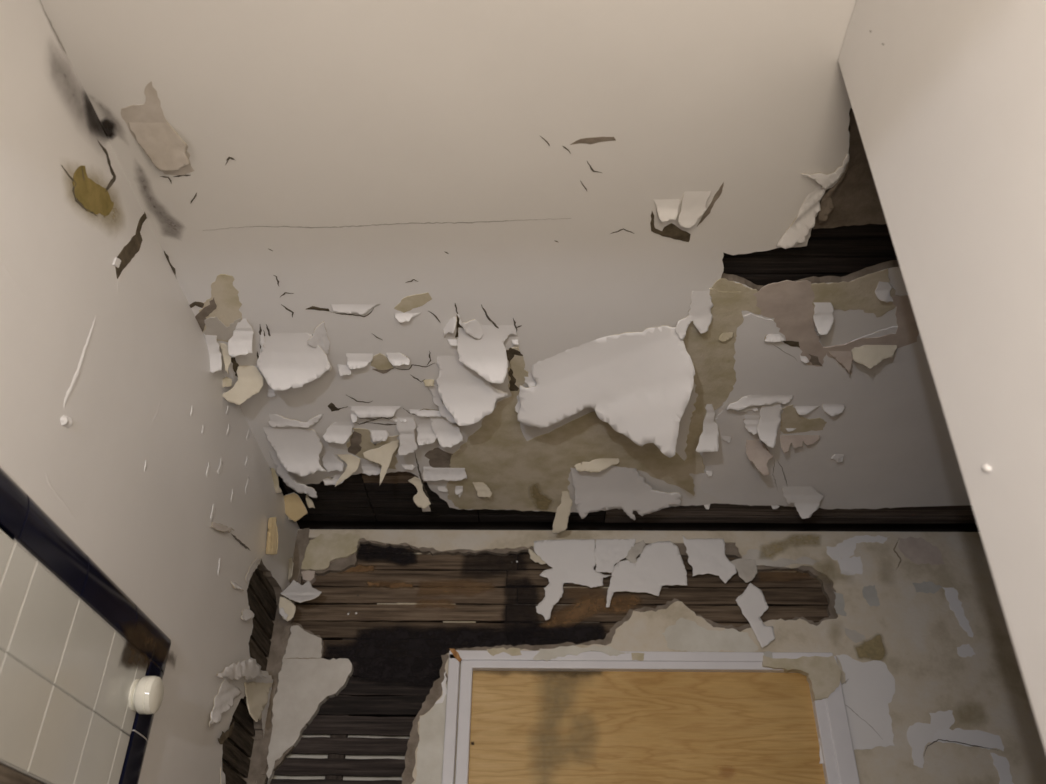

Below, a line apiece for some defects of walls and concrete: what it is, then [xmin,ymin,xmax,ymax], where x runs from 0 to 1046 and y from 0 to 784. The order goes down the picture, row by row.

water stain [63,73,115,139]
peeling [113,81,194,184]
peeling [140,179,180,235]
flaking render [818,155,850,223]
flaking render [189,268,979,784]
water stain [325,543,640,687]